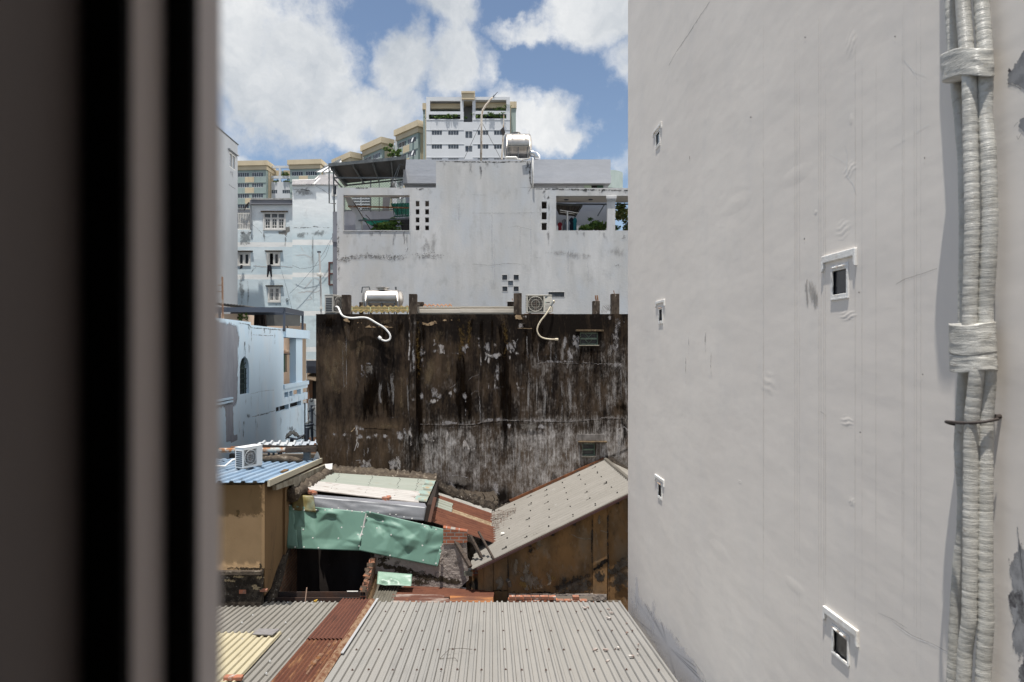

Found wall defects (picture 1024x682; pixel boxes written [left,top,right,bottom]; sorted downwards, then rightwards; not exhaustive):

spalling [1007,51,1024,89]
leakage [333,325,472,467]
leakage [471,320,543,440]
leakage [563,336,602,372]
corrosion [271,598,379,682]
leakage [554,515,700,682]
spalling [1008,527,1024,682]